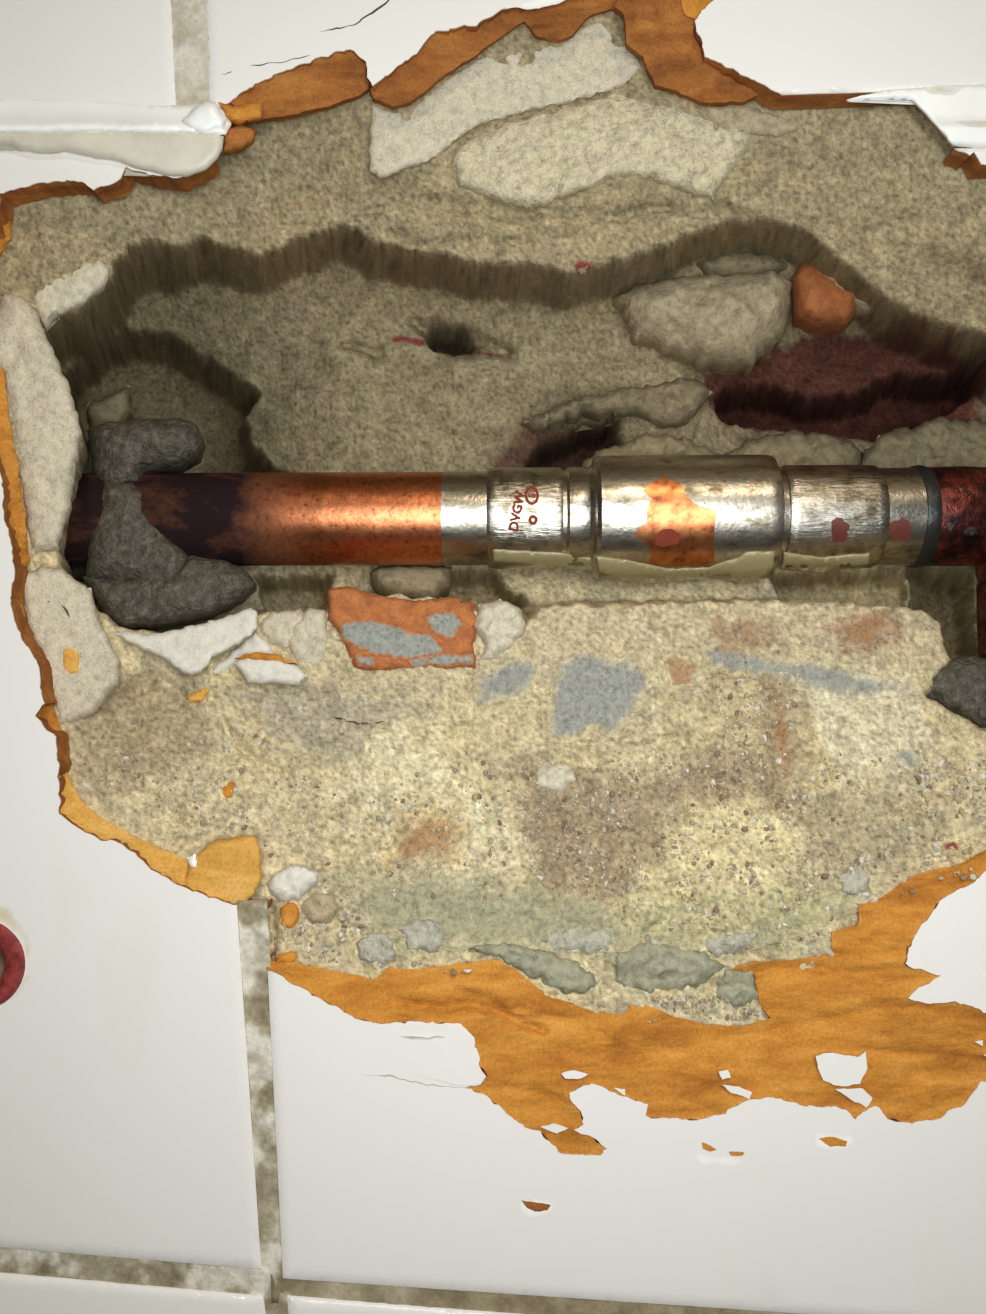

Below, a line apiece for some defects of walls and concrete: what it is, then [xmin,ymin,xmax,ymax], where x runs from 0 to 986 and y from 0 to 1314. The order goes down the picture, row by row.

crack [223,0,389,75]
spalling [0,0,986,1027]
peeling [266,850,986,1155]